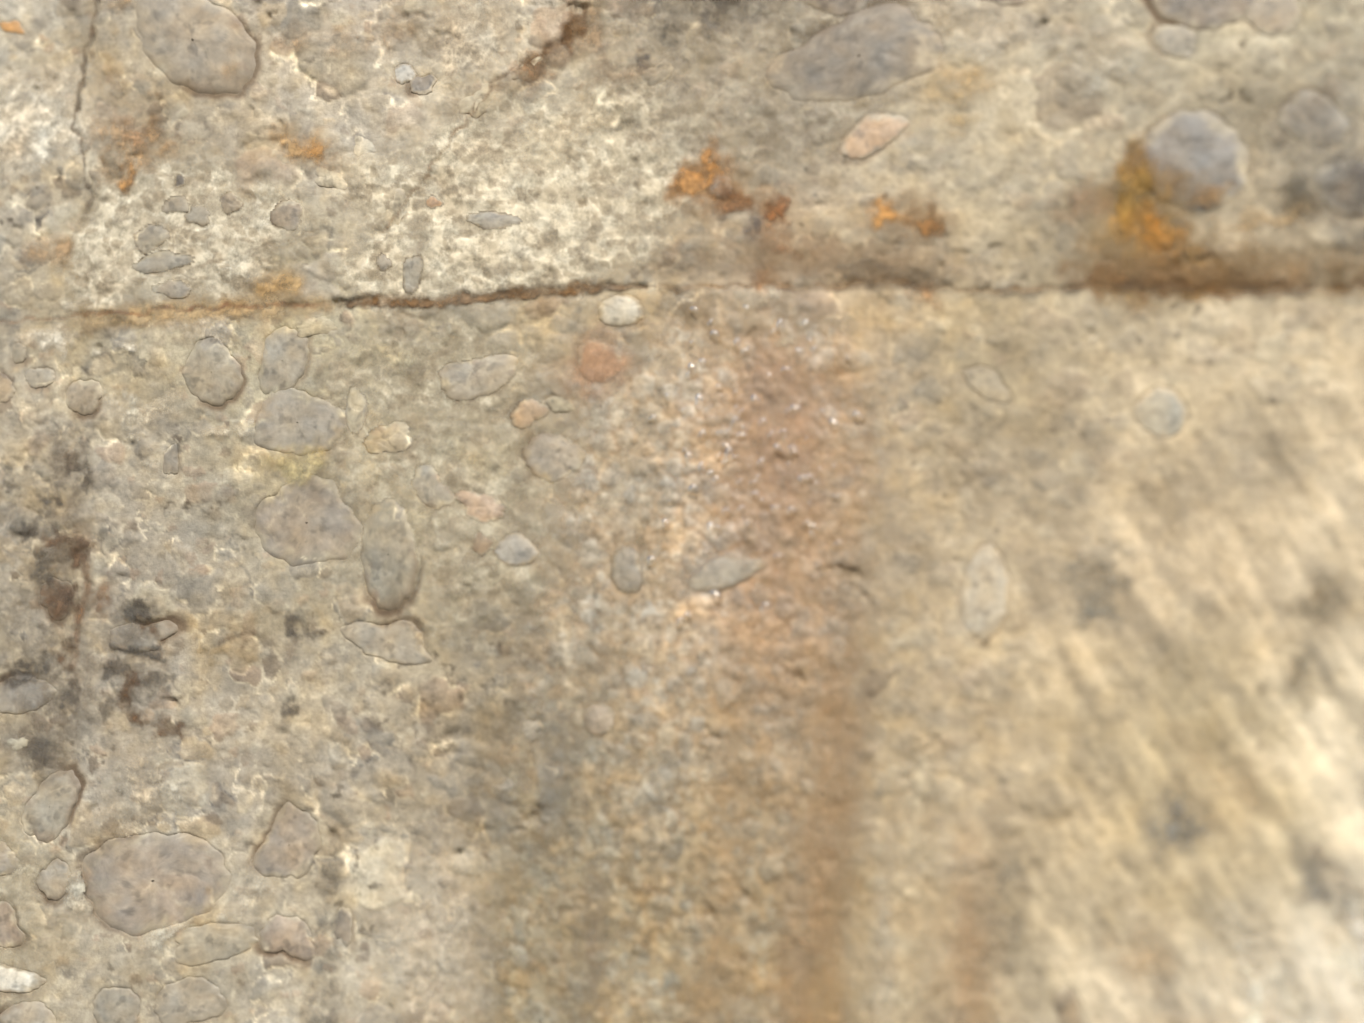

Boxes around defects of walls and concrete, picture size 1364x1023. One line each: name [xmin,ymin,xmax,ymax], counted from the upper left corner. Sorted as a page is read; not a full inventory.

crack [75,25,95,139]
rust [675,148,790,289]
rust [873,199,944,236]
crack [296,279,932,308]
crack [975,276,1364,293]
leakage [5,435,165,768]